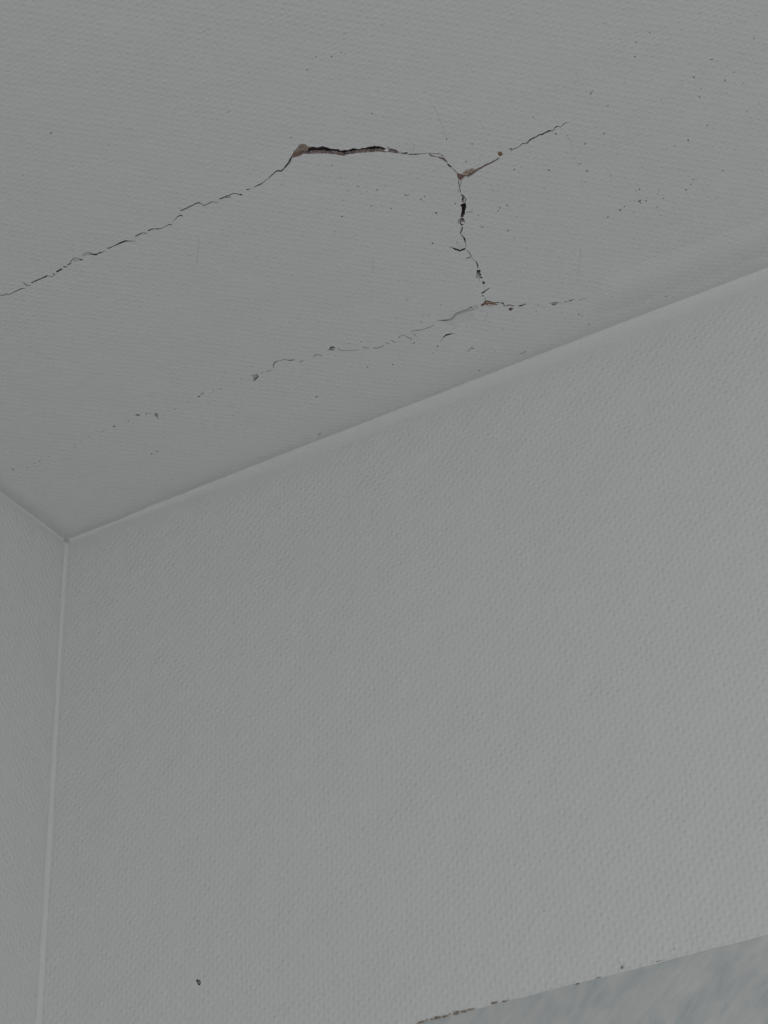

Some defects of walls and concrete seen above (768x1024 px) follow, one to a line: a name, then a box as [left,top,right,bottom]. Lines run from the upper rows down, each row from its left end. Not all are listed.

crack [1,91,590,381]